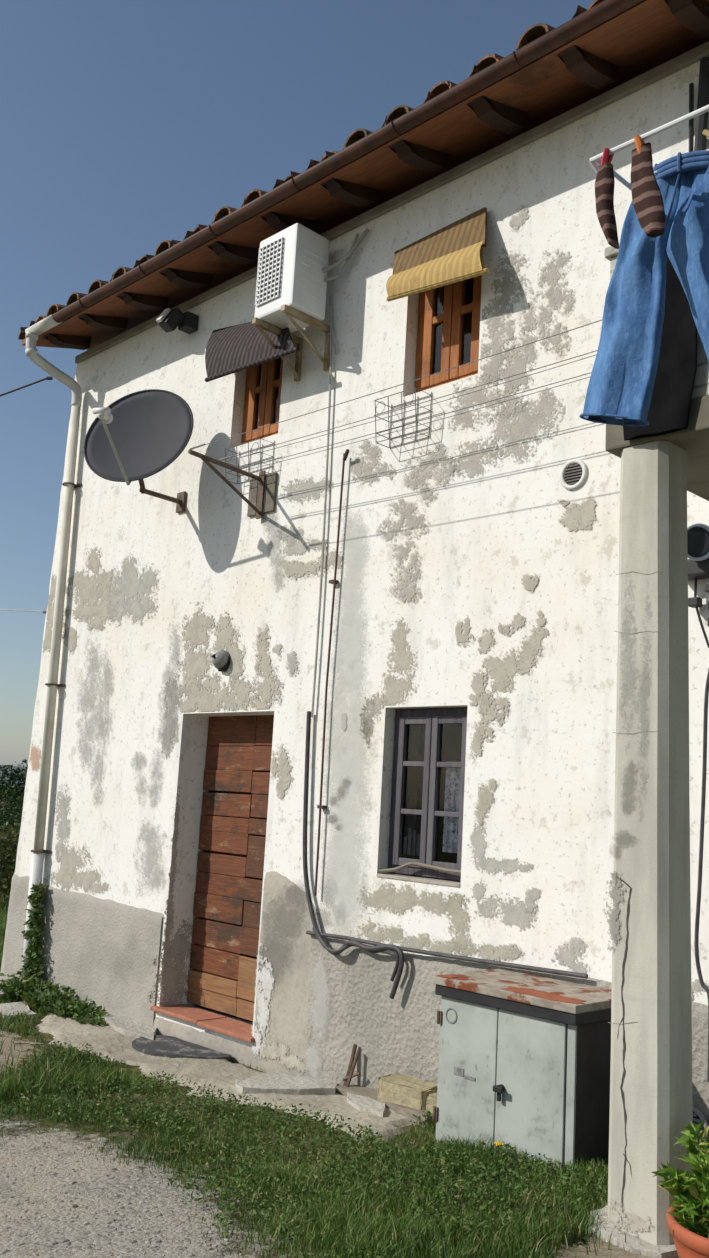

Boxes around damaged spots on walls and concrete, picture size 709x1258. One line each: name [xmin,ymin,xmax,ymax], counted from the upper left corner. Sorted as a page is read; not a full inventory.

peeling [509,205,529,232]
peeling [43,548,165,657]
peeling [280,476,333,504]
peeling [277,525,344,581]
peeling [341,248,575,757]
peeling [558,497,597,532]
peeling [161,602,299,759]
peeling [42,784,109,895]
peeling [357,779,541,961]
crack [608,875,636,1220]